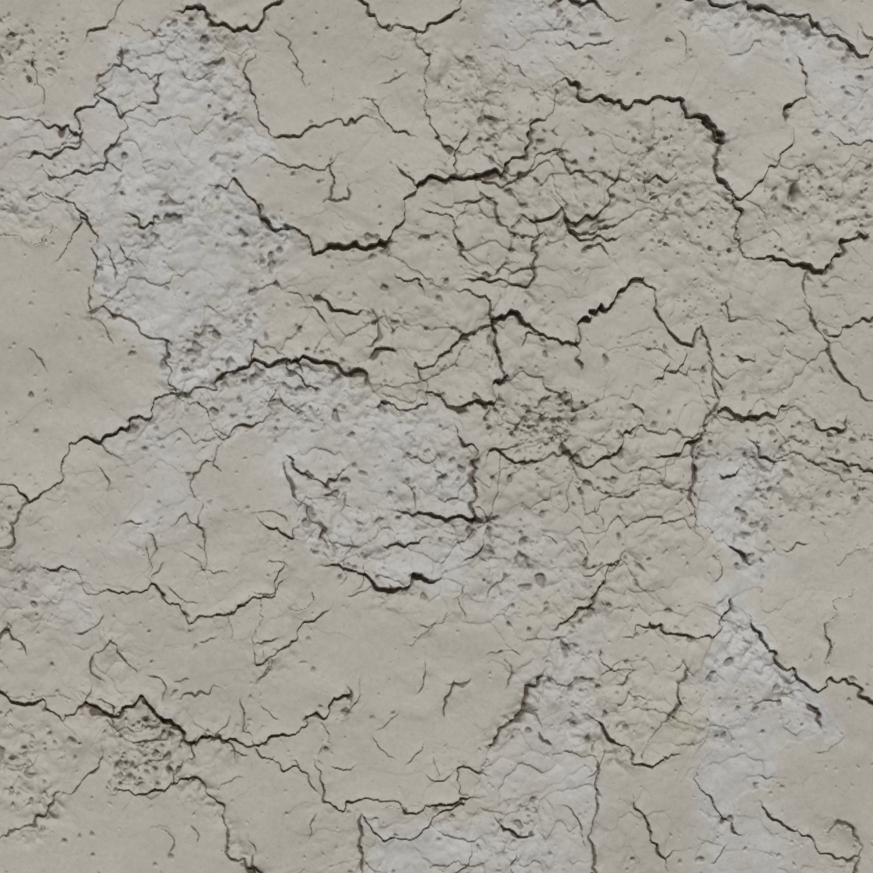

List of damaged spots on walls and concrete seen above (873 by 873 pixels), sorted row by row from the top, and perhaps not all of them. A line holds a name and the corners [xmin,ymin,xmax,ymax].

peeling [0,0,613,873]
crack [0,0,873,669]
crack [0,638,553,873]
crack [577,539,873,873]
peeling [688,609,848,873]